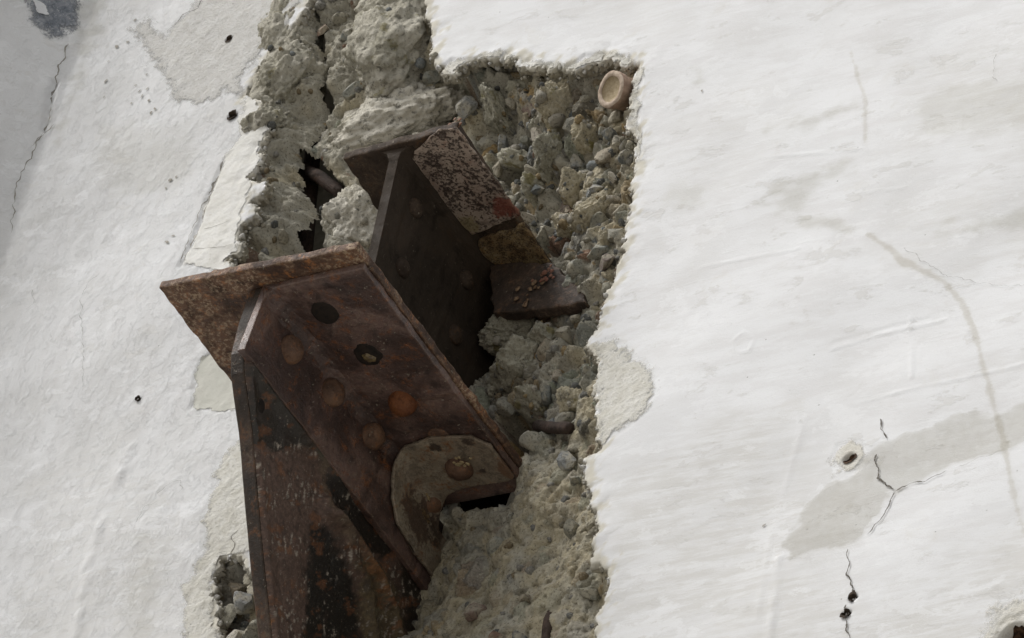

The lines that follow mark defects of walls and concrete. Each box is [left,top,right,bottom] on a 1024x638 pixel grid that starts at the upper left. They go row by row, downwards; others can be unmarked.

crack [10,45,68,229]
spalling [115,0,654,638]
crack [870,419,945,532]
crack [844,550,854,637]